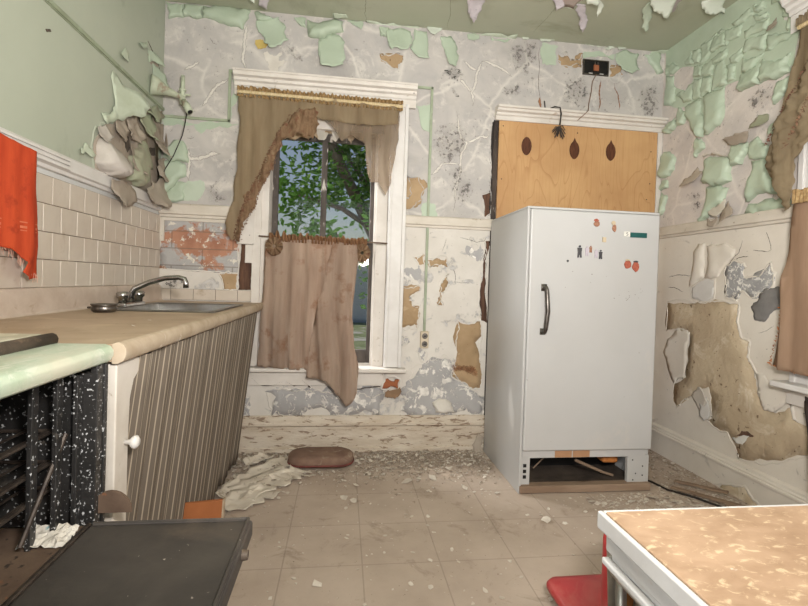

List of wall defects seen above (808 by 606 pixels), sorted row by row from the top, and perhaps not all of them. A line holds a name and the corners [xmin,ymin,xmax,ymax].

peeling [166,0,289,48]
peeling [294,13,459,71]
peeling [467,0,488,23]
peeling [80,70,238,209]
peeling [533,0,801,227]
flaking render [406,176,437,216]
flaking render [481,192,491,219]
flaking render [159,220,240,290]
peeling [264,240,490,416]
flaking render [663,259,808,466]